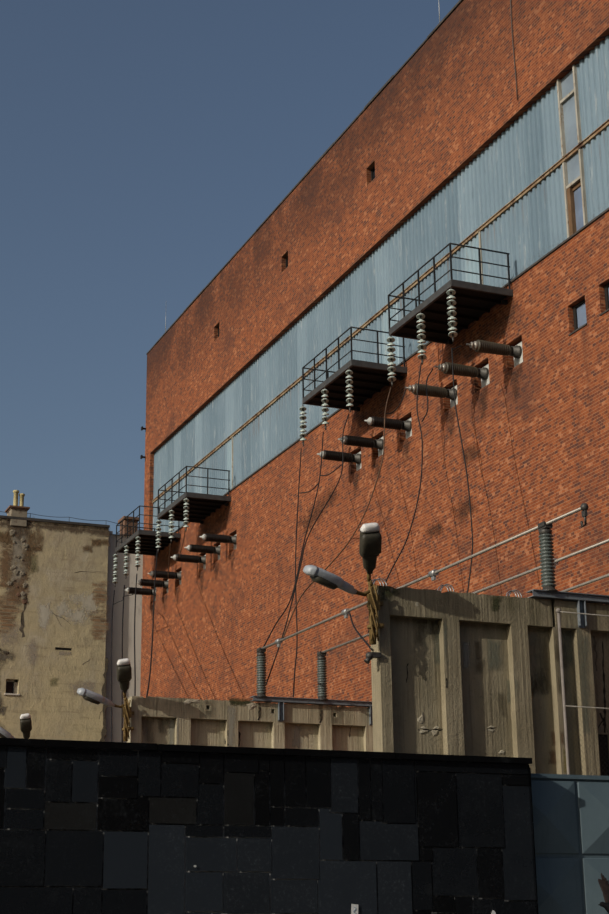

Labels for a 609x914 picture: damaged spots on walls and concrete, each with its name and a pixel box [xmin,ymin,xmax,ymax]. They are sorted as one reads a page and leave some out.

peeling [0,523,29,629]
crack [19,595,71,637]
crack [593,636,608,733]